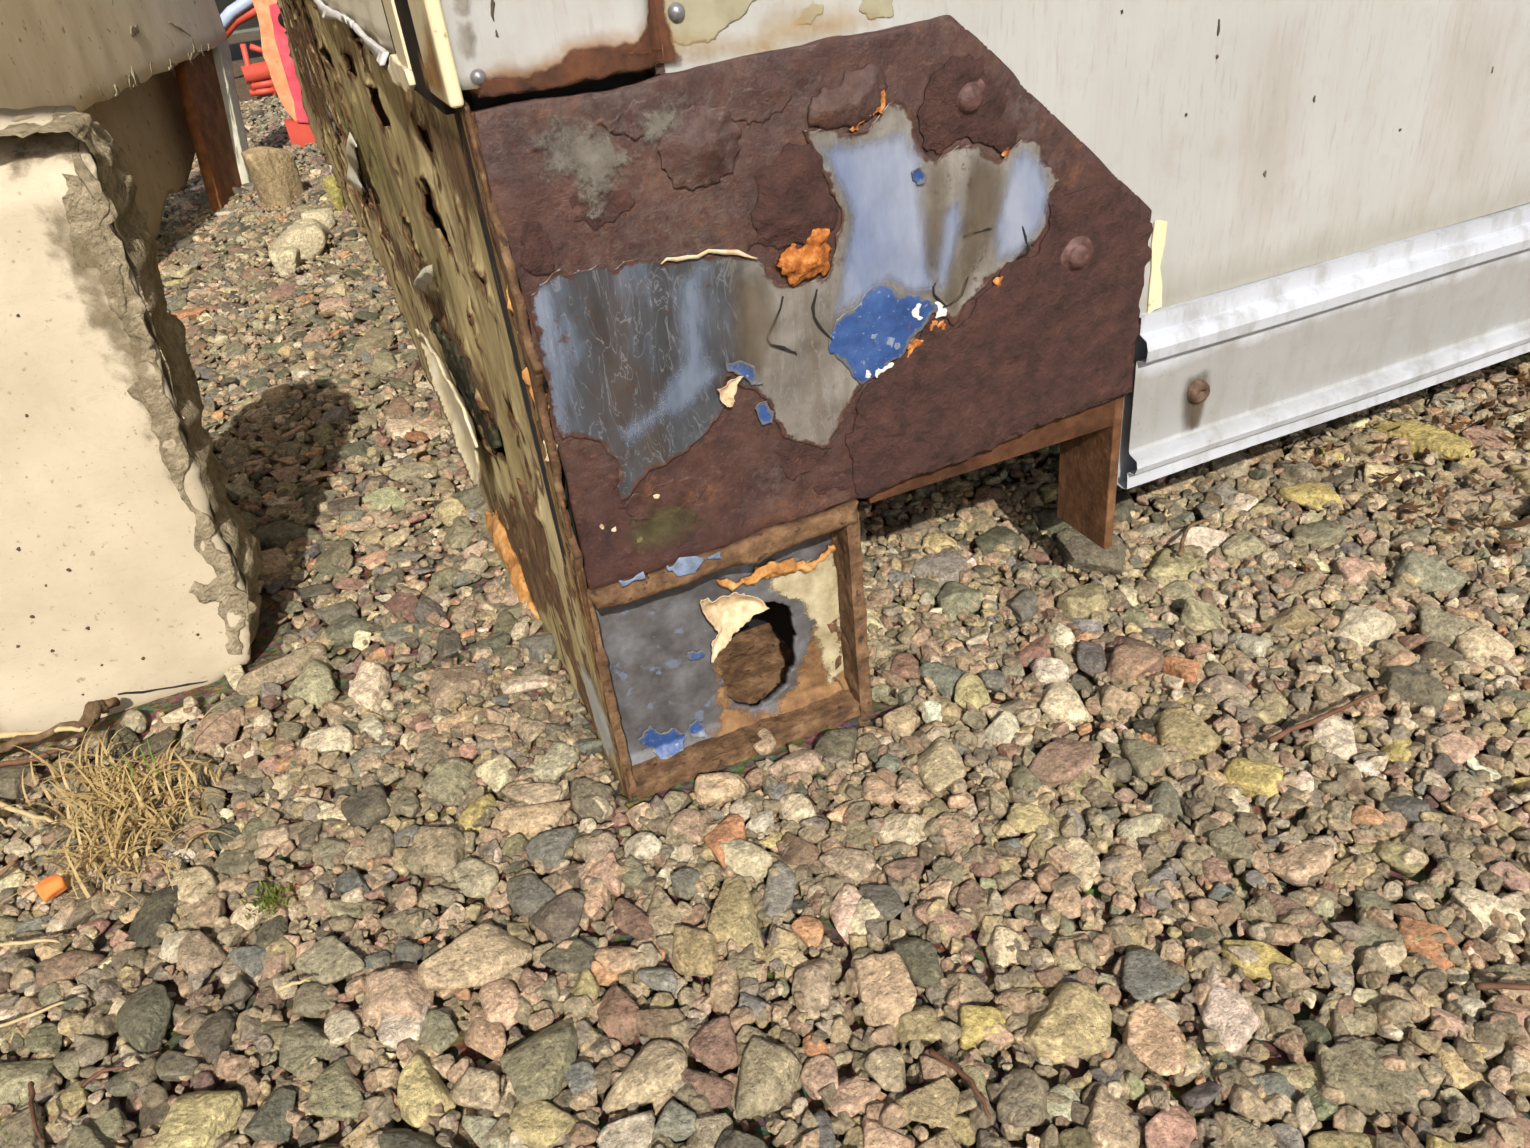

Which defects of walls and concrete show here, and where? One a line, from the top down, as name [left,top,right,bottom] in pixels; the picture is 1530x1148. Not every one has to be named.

corrosion [281,0,373,132]
corrosion [479,0,682,97]
peeling [664,0,755,46]
peeling [796,2,824,25]
peeling [859,0,894,19]
corrosion [748,63,888,286]
corrosion [374,207,503,456]
peeling [506,100,1060,501]
corrosion [845,185,1154,499]
corrosion [418,24,625,793]
peeling [688,720,709,738]